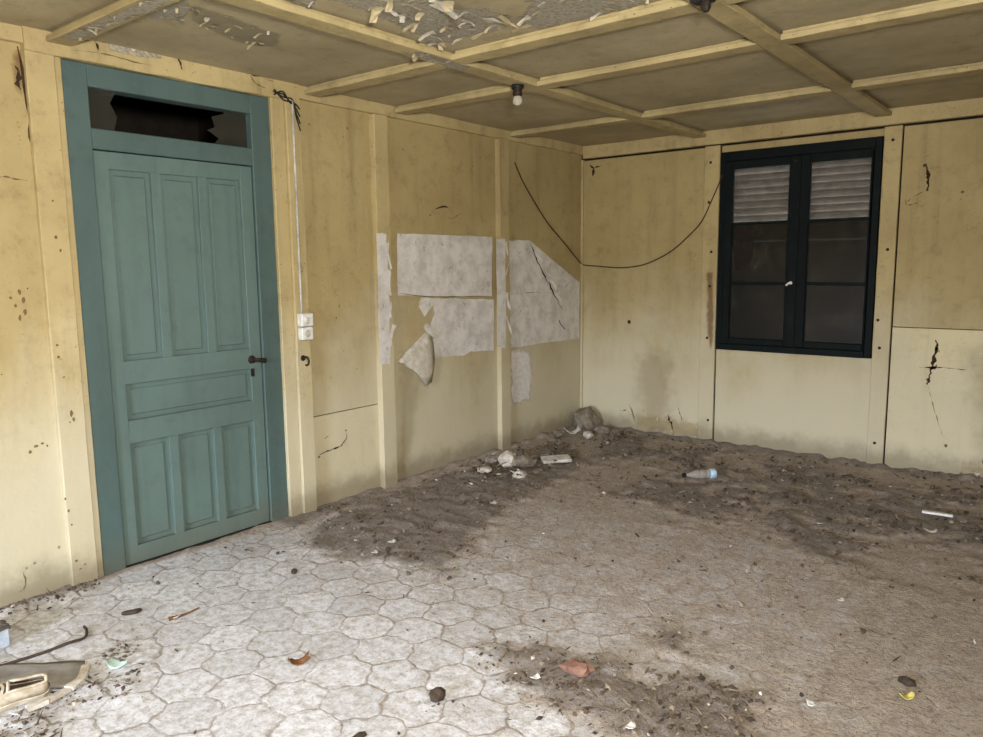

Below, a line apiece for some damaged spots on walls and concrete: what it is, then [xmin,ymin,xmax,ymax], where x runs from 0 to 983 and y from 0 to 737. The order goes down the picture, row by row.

peeling [291,0,316,9]
peeling [335,0,649,71]
crack [921,340,965,433]